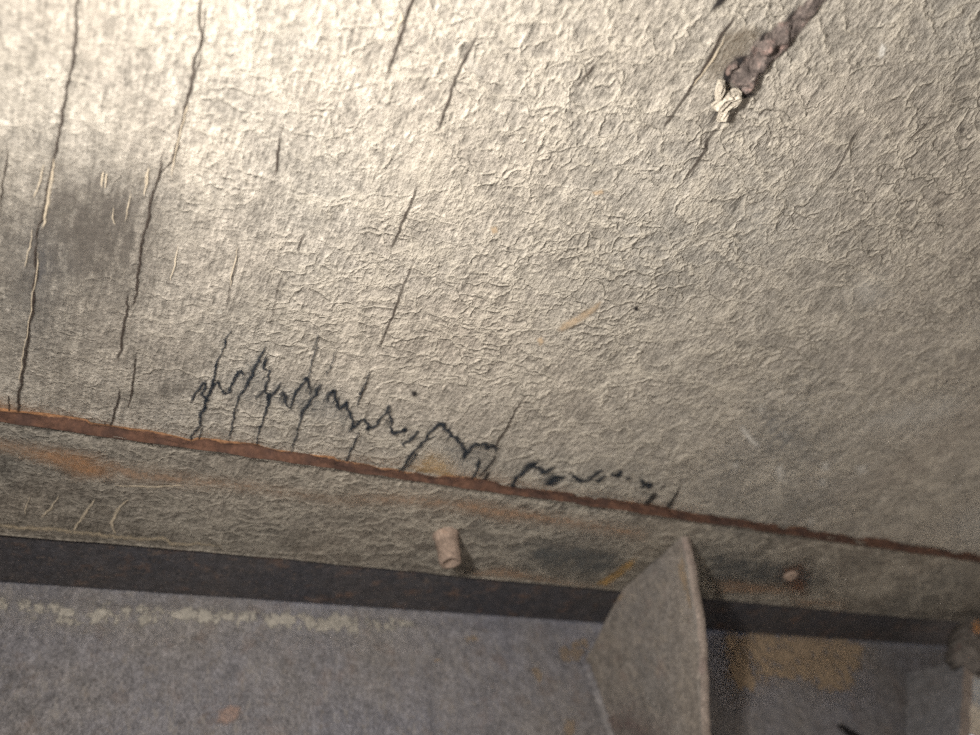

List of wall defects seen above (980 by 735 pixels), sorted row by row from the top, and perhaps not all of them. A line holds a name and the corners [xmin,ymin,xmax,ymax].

spalling [708,0,825,124]
crack [0,150,8,209]
crack [8,0,78,412]
crack [104,0,205,426]
crack [390,187,416,248]
crack [378,261,414,349]
crack [190,280,525,480]
corrosion [0,408,980,562]
crack [511,460,679,508]